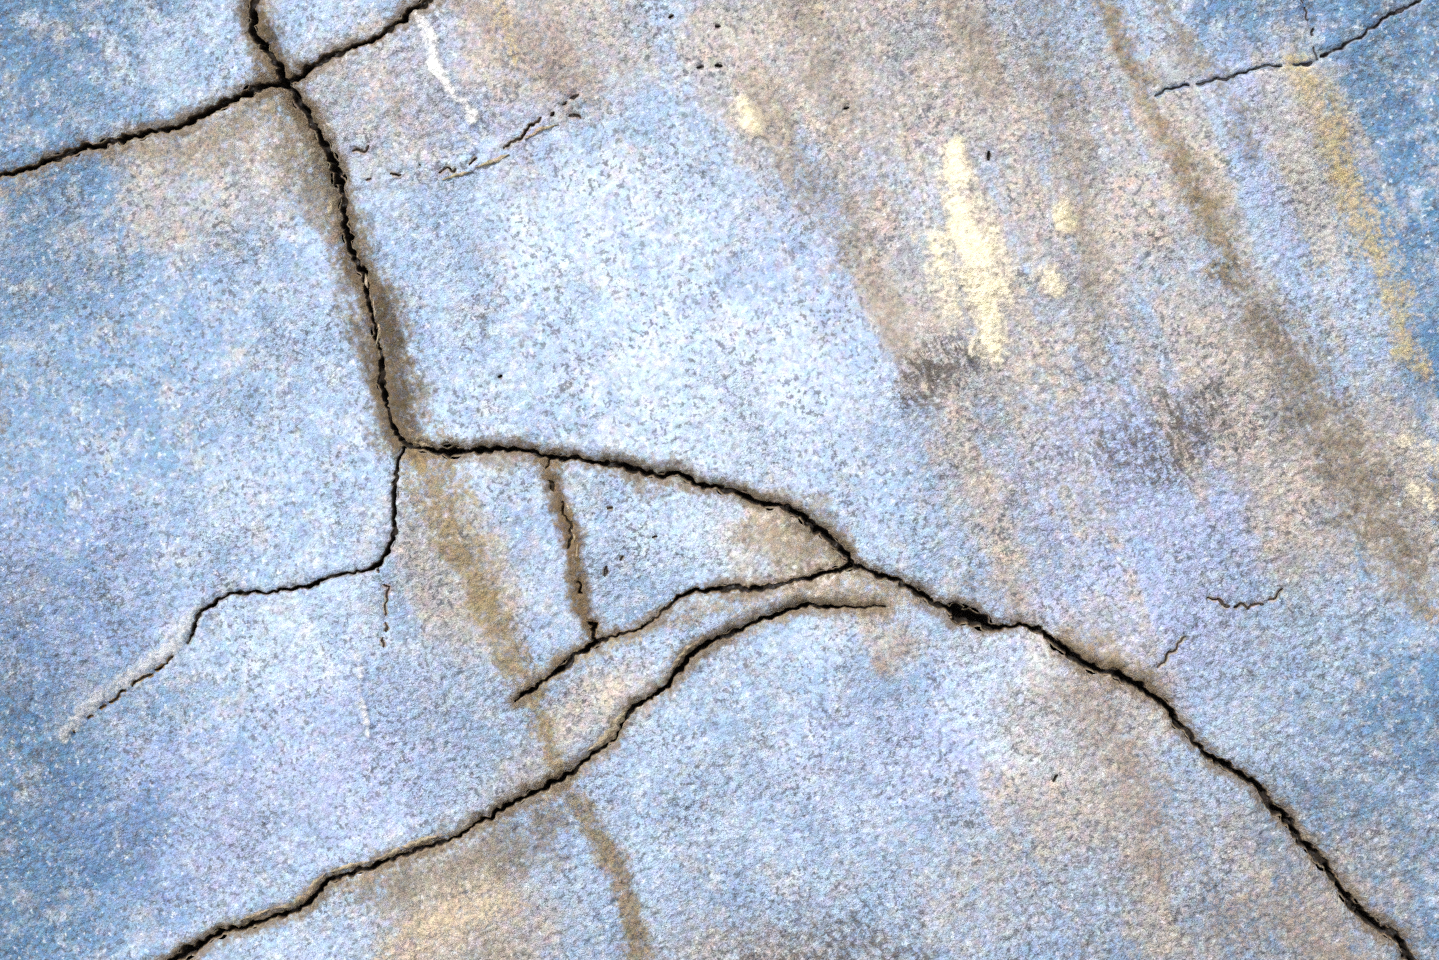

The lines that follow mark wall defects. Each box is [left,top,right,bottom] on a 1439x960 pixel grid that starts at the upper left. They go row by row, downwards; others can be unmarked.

crack [289,0,434,86]
crack [1154,0,1425,99]
crack [0,80,288,179]
crack [247,0,381,347]
crack [390,93,582,180]
crack [72,654,175,733]
crack [167,332,1417,960]